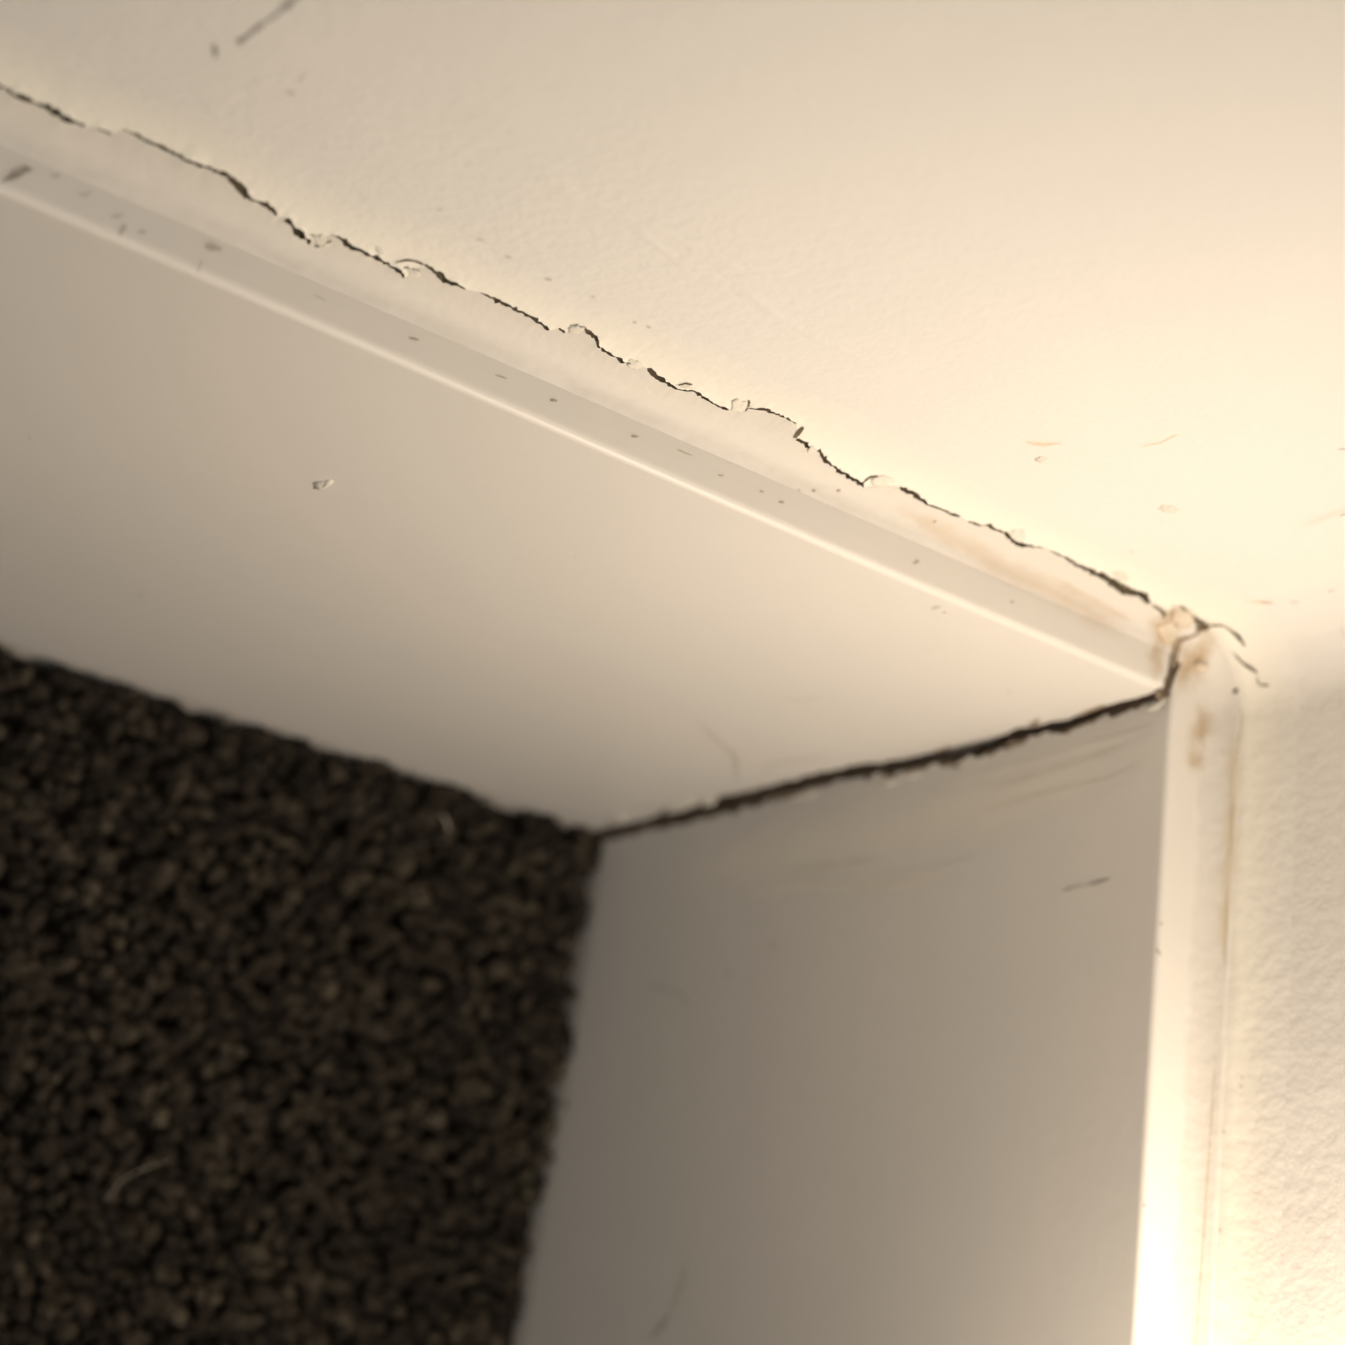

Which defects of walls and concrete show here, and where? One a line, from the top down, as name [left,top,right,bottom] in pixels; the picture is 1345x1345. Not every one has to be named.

crack [0,85,1270,711]
crack [591,705,1112,841]